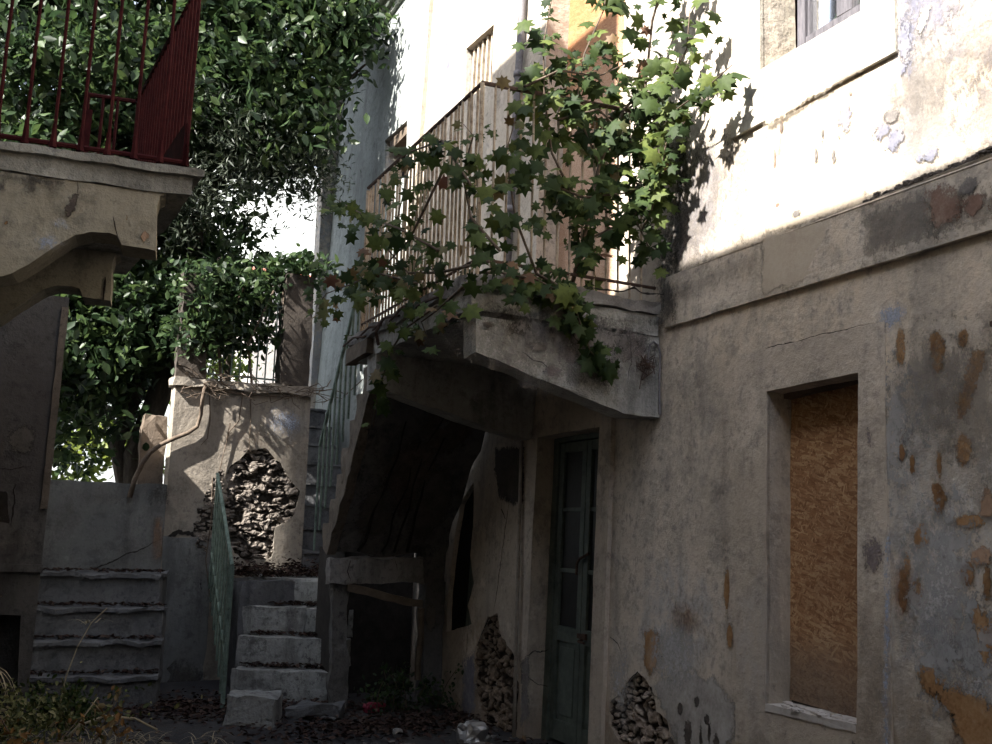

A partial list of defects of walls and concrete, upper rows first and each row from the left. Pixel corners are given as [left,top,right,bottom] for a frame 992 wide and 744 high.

flaking render [870,109,905,152]
flaking render [863,146,992,230]
flaking render [896,328,905,366]
flaking render [928,329,946,373]
flaking render [955,329,988,419]
flaking render [191,447,299,563]
flaking render [494,446,525,506]
flaking render [931,452,947,516]
flaking render [960,545,992,671]
flaking render [475,615,519,744]
flaking render [610,629,736,744]
flaking render [917,664,992,744]